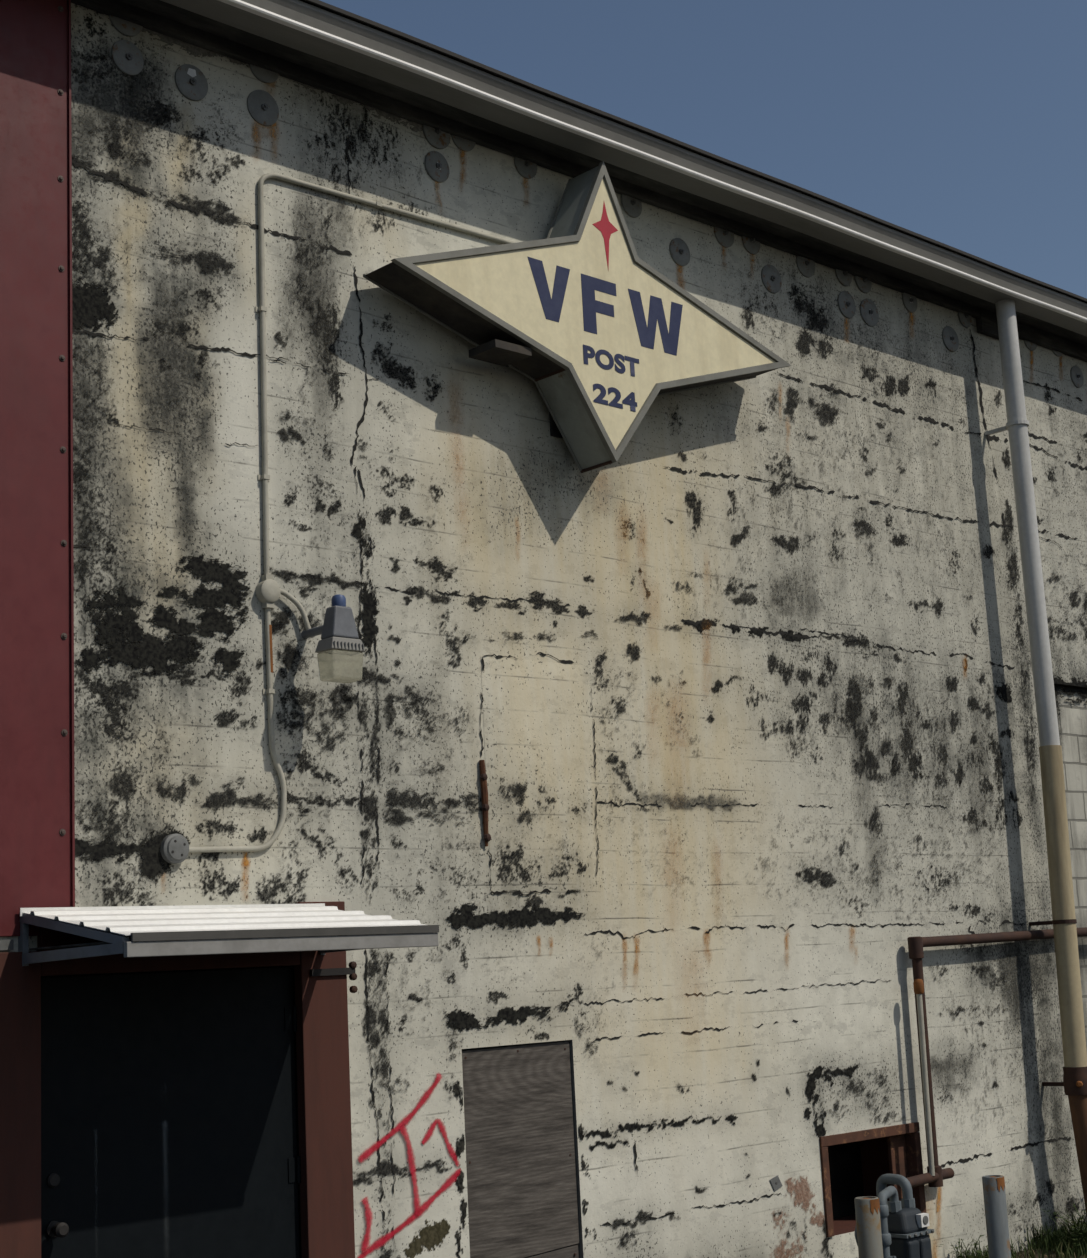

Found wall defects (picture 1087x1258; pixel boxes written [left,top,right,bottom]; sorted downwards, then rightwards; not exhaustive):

damp [71,11,251,296]
crack [779,330,1087,480]
crack [72,115,604,897]
mould [773,507,910,564]
crack [665,467,1082,548]
crack [681,619,1015,672]
damp [75,567,482,906]
rust [479,760,491,847]
damp [711,633,1036,899]
crack [584,920,1026,940]
damp [353,949,452,1258]
flaking render [773,1176,825,1258]